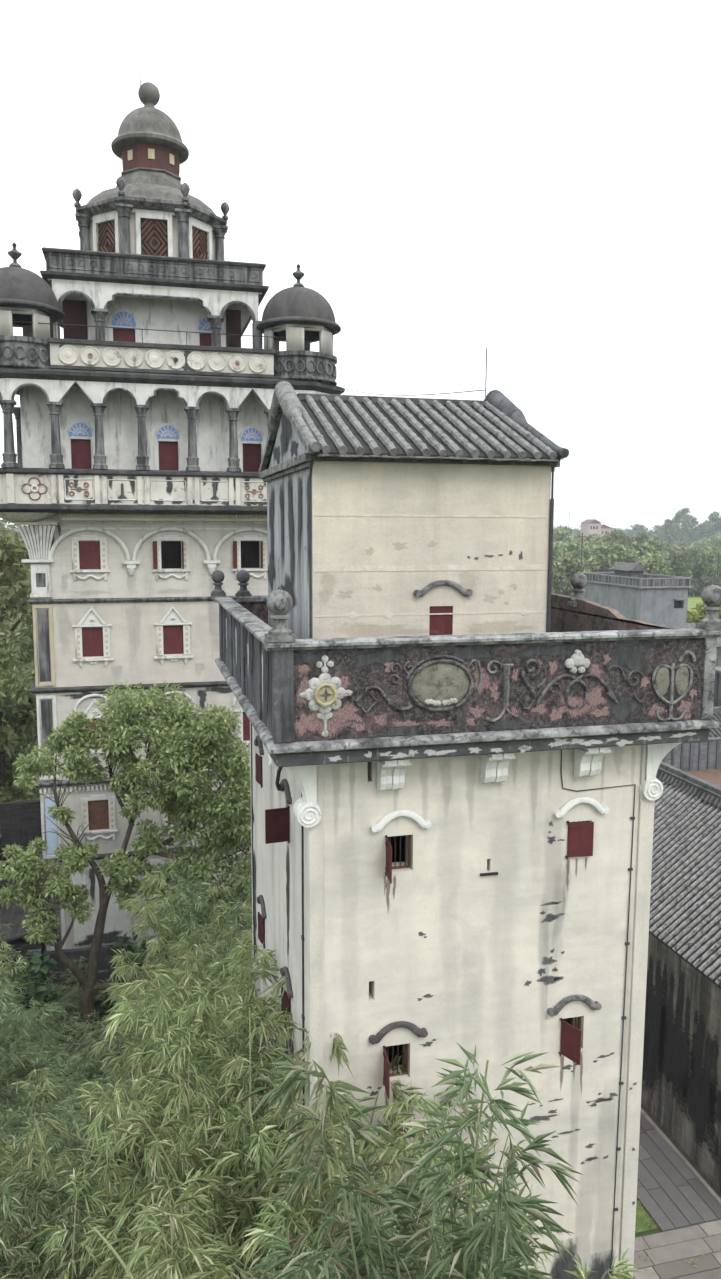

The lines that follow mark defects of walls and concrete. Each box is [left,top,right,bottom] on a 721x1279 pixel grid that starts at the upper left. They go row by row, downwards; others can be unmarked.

leakage [297,652,325,668]
leakage [490,718,525,730]
leakage [365,726,502,758]
leakage [549,732,696,747]
flaking render [540,901,565,923]
flaking render [524,949,565,986]
leakage [642,955,721,1163]
flaking render [586,1082,637,1107]